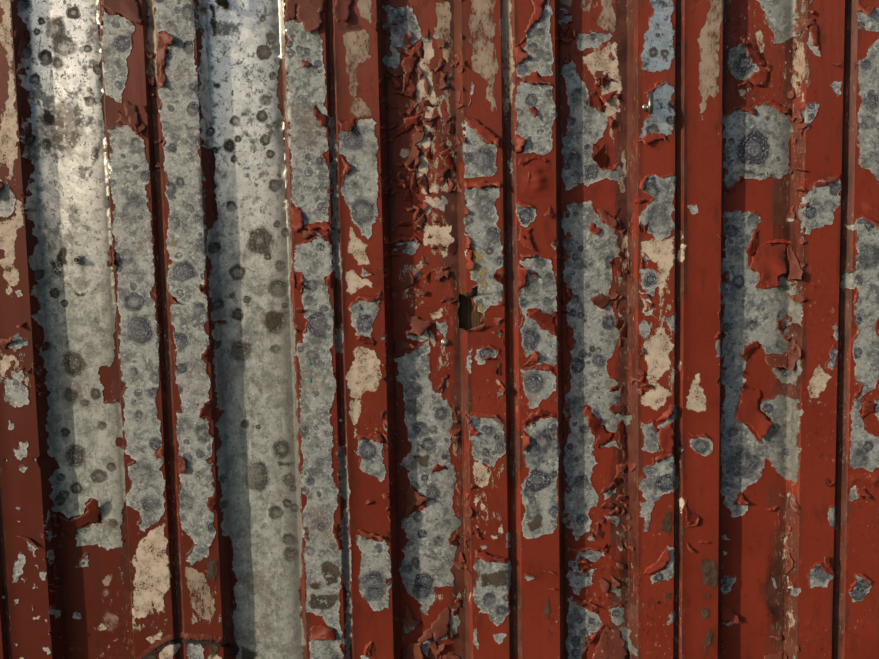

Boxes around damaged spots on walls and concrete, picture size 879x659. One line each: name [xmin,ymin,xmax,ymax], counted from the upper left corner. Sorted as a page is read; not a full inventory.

peeling [638,0,676,145]
peeling [698,0,821,193]
peeling [829,80,843,98]
peeling [0,0,627,659]
peeling [514,172,840,659]
peeling [848,484,872,502]